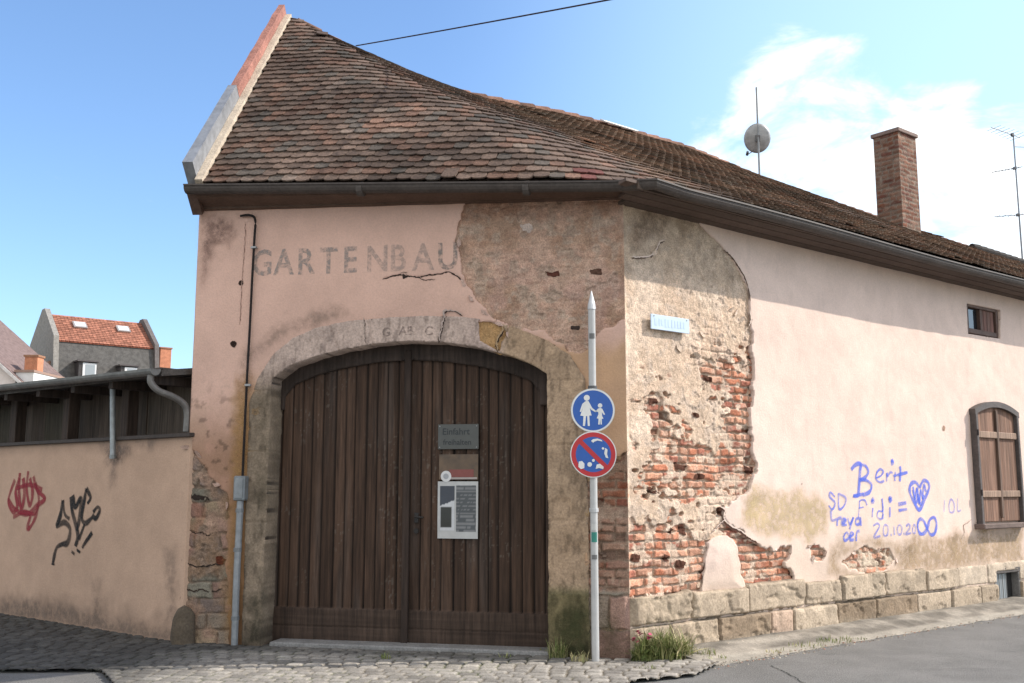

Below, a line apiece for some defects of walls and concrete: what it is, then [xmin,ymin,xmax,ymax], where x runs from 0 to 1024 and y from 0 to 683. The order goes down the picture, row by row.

crack [632,240,664,259]
crack [383,270,462,281]
flaking render [455,199,792,660]
leakage [745,489,827,540]
flaking render [180,445,231,644]
flaking render [807,545,828,564]
flaking render [842,546,898,574]